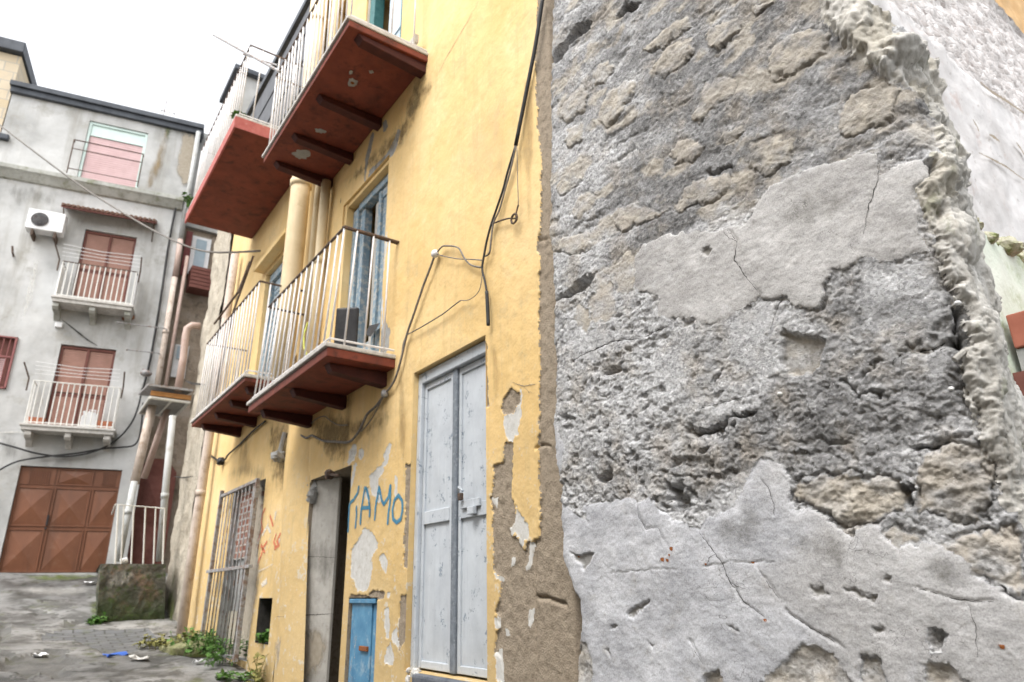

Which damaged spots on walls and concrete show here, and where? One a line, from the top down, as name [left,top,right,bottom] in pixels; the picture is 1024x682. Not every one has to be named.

spalling [487,0,1024,682]
peeling [349,527,407,665]
crack [699,532,778,617]